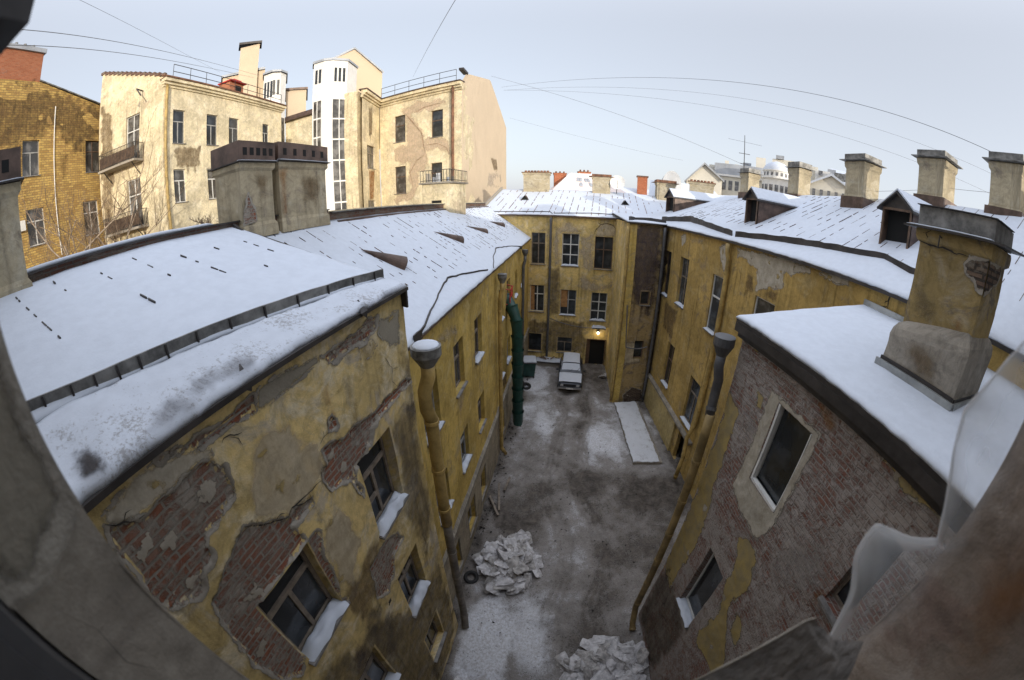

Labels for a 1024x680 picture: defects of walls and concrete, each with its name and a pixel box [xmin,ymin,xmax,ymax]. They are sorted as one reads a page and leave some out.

crack [406,103,449,184]
peeling [719,244,849,291]
spalling [963,254,1001,297]
spalling [101,309,412,680]
spalling [696,388,822,672]